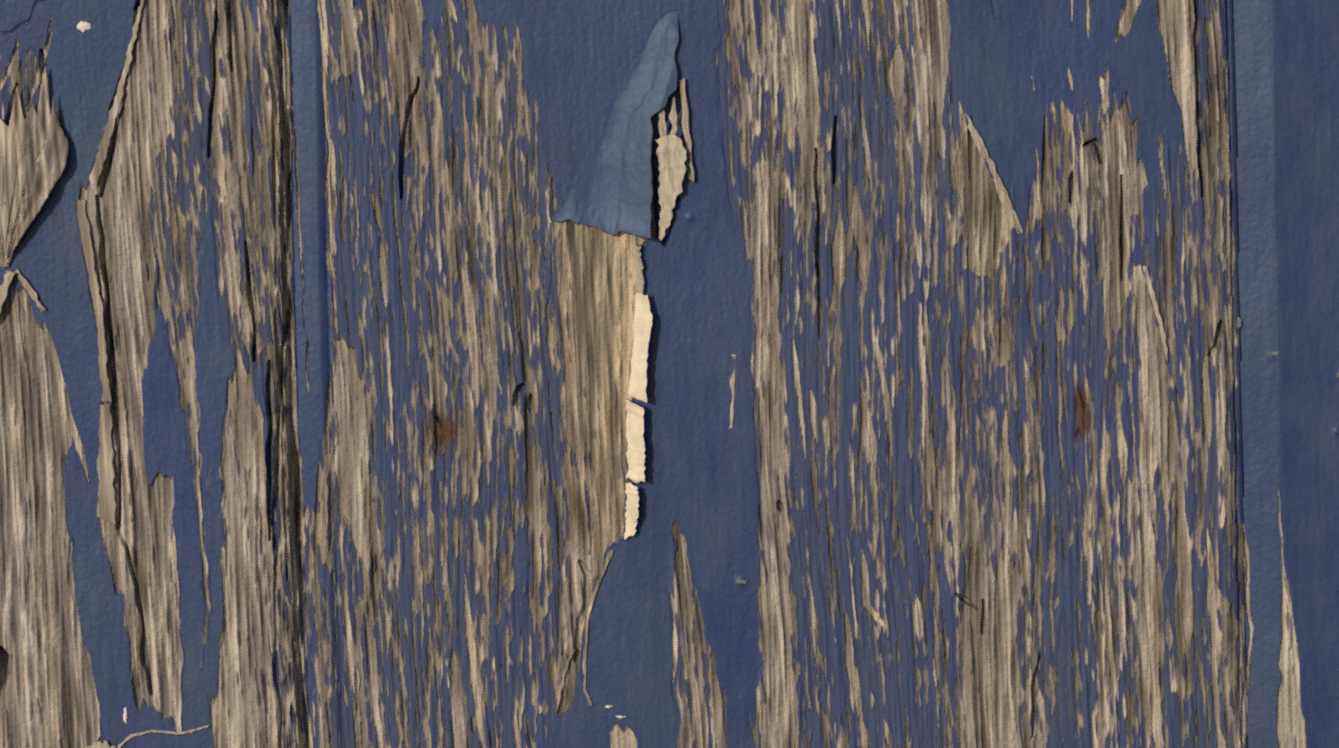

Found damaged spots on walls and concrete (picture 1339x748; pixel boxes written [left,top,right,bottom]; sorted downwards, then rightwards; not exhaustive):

crack [0,0,52,38]
peeling [0,0,695,748]
peeling [713,0,1254,748]
peeling [670,520,729,748]
peeling [1276,493,1307,748]